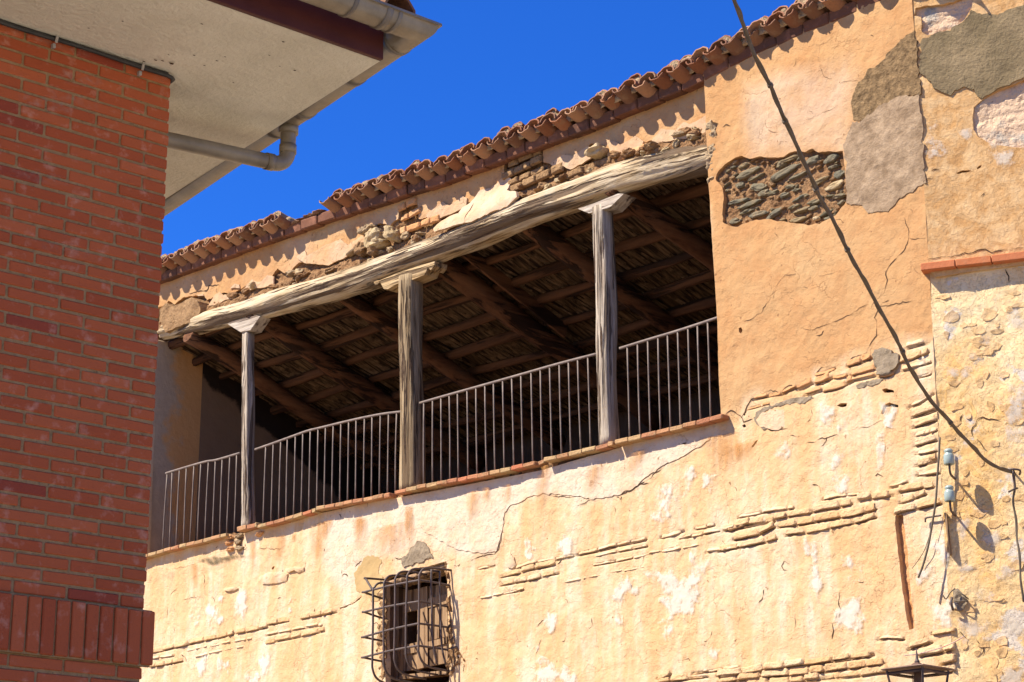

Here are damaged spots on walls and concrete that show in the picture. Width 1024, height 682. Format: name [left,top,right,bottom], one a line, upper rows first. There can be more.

flaking render [501,115,706,199]
flaking render [718,151,847,227]
peeling [197,196,468,306]
crack [803,221,1024,372]
crack [725,385,906,446]
crack [615,442,687,512]
peeling [613,578,638,599]